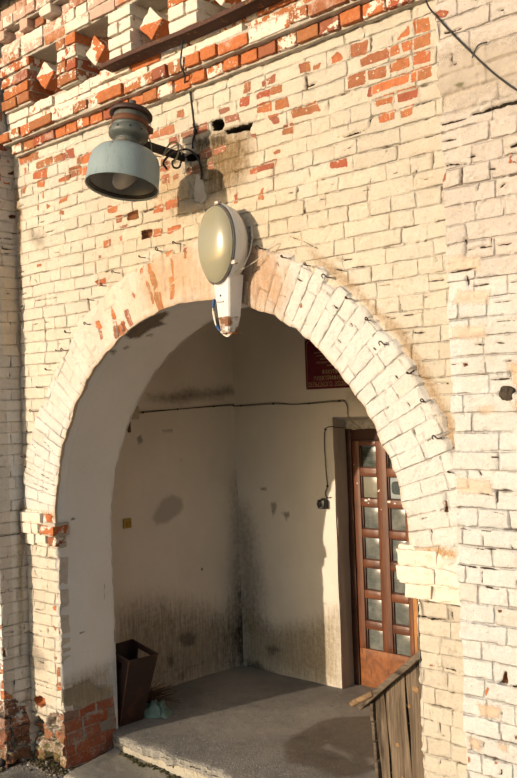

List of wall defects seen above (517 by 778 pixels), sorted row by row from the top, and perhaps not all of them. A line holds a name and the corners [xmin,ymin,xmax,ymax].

peeling [19,148,92,215]
water stain [197,135,247,190]
water stain [128,609,333,686]
flaking render [0,624,116,769]